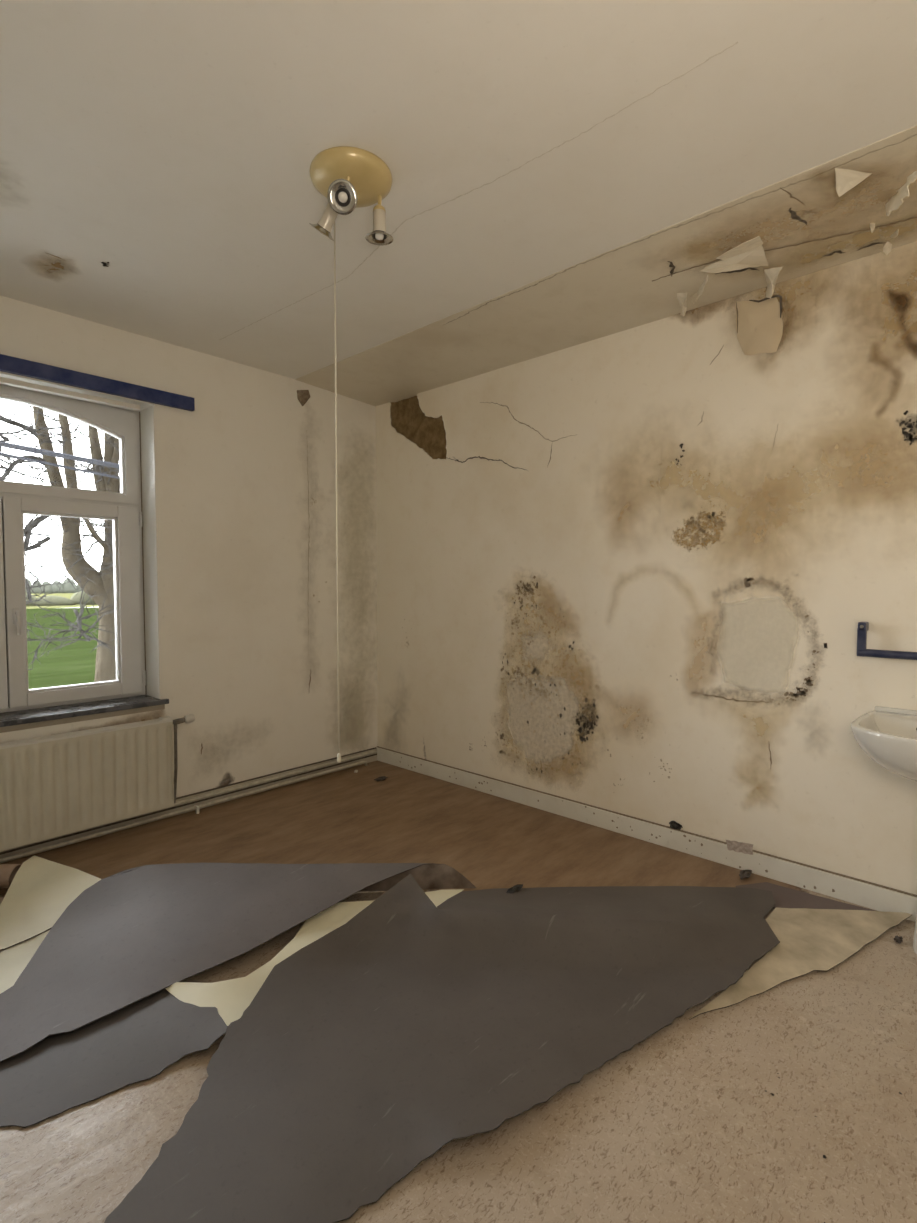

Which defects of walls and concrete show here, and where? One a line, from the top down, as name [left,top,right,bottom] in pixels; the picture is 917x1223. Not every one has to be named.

peeling [835,168,872,197]
peeling [870,171,917,233]
peeling [677,236,783,316]
spalling [297,390,310,406]
spalling [389,396,448,461]
crack [445,402,575,471]
mould [899,410,917,445]
leakage [674,511,725,550]